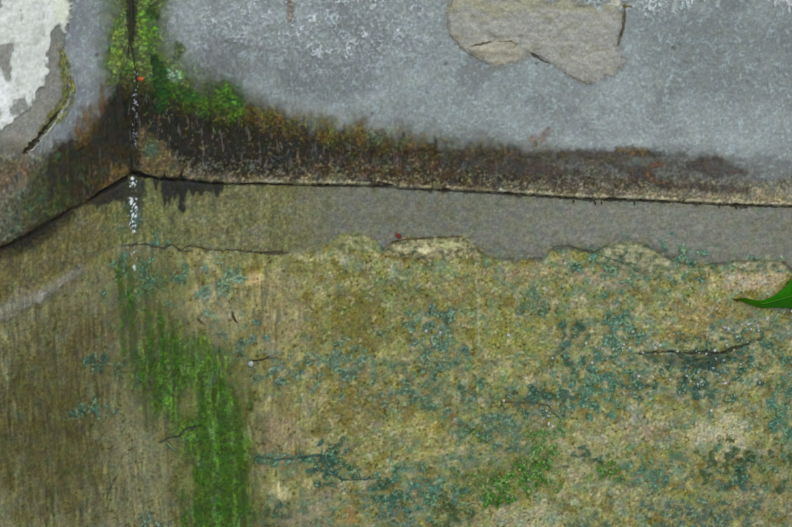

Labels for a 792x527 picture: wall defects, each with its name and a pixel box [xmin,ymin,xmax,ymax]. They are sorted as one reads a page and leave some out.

spalling [445,0,632,84]
crack [0,0,156,252]
leakage [0,68,749,258]
crack [216,180,792,209]
crack [124,243,288,255]
crack [638,337,764,370]